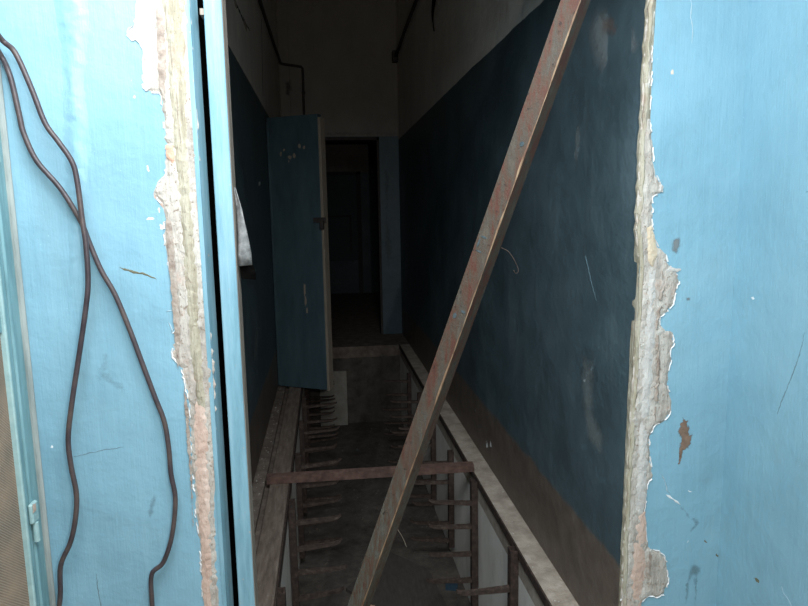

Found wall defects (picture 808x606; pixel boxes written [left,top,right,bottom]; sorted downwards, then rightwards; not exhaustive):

flaking render [126,0,219,606]
flaking render [618,0,681,606]
corrosion [678,419,692,464]